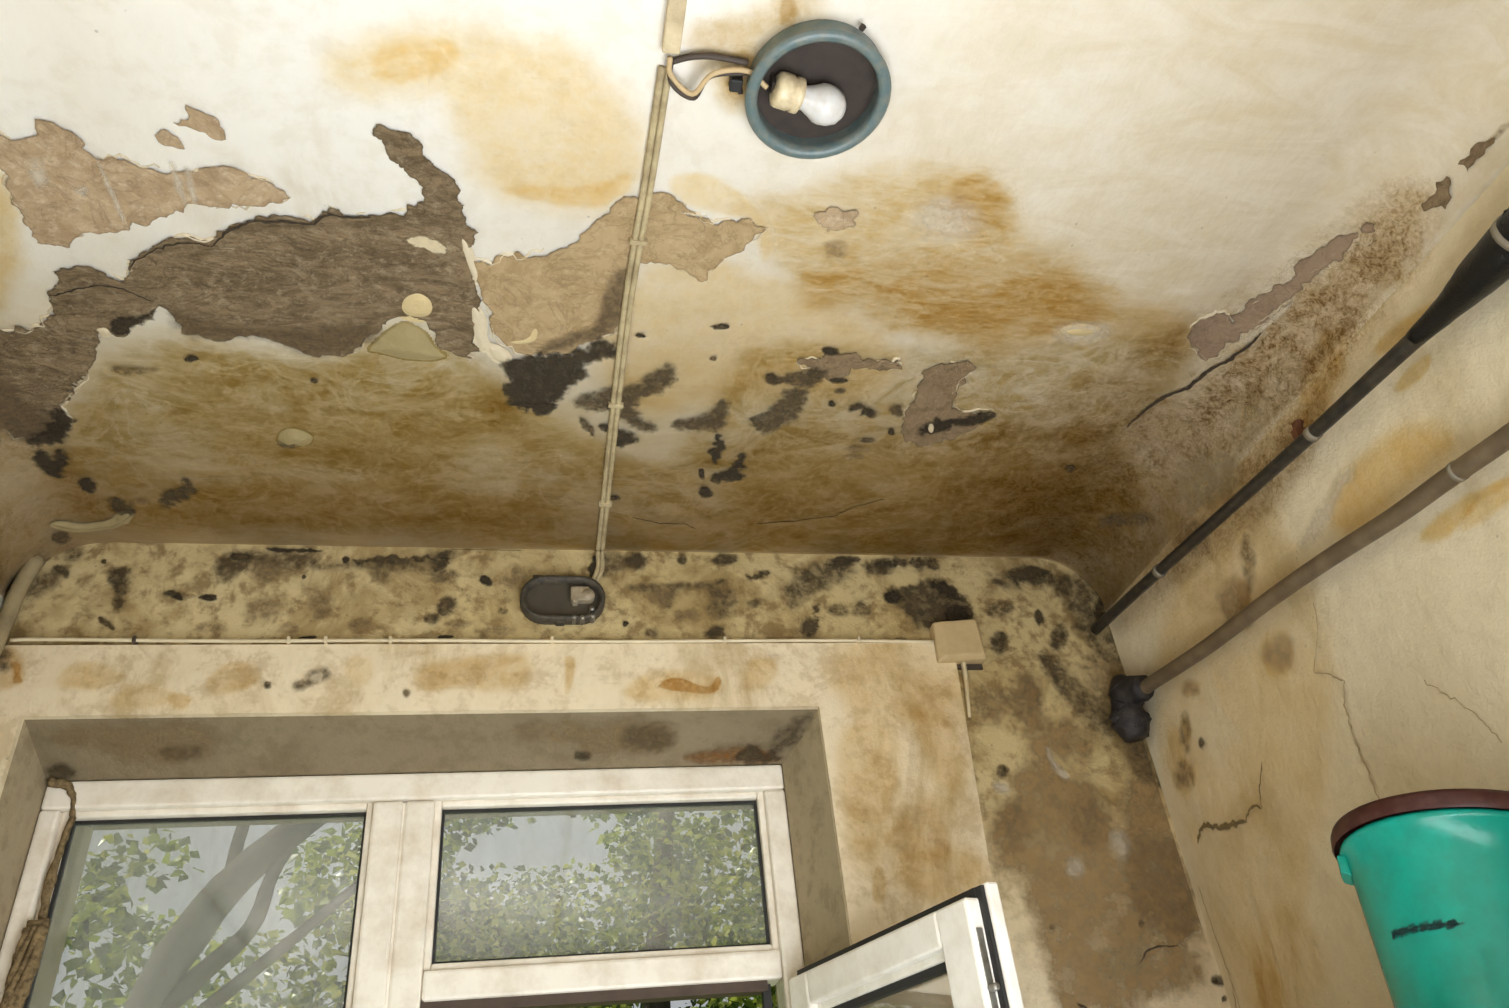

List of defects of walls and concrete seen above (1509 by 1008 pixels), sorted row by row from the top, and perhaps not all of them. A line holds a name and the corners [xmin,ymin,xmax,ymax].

peeling [1421,130,1502,211]
spalling [0,105,768,441]
mould [26,408,76,479]
mould [485,340,675,448]
mould [673,400,746,498]
mould [749,347,903,459]
peeling [901,361,995,447]
mould [164,547,465,639]
mould [588,553,770,638]
water stain [786,556,1124,734]
crack [1313,603,1379,799]
crack [1197,766,1263,841]